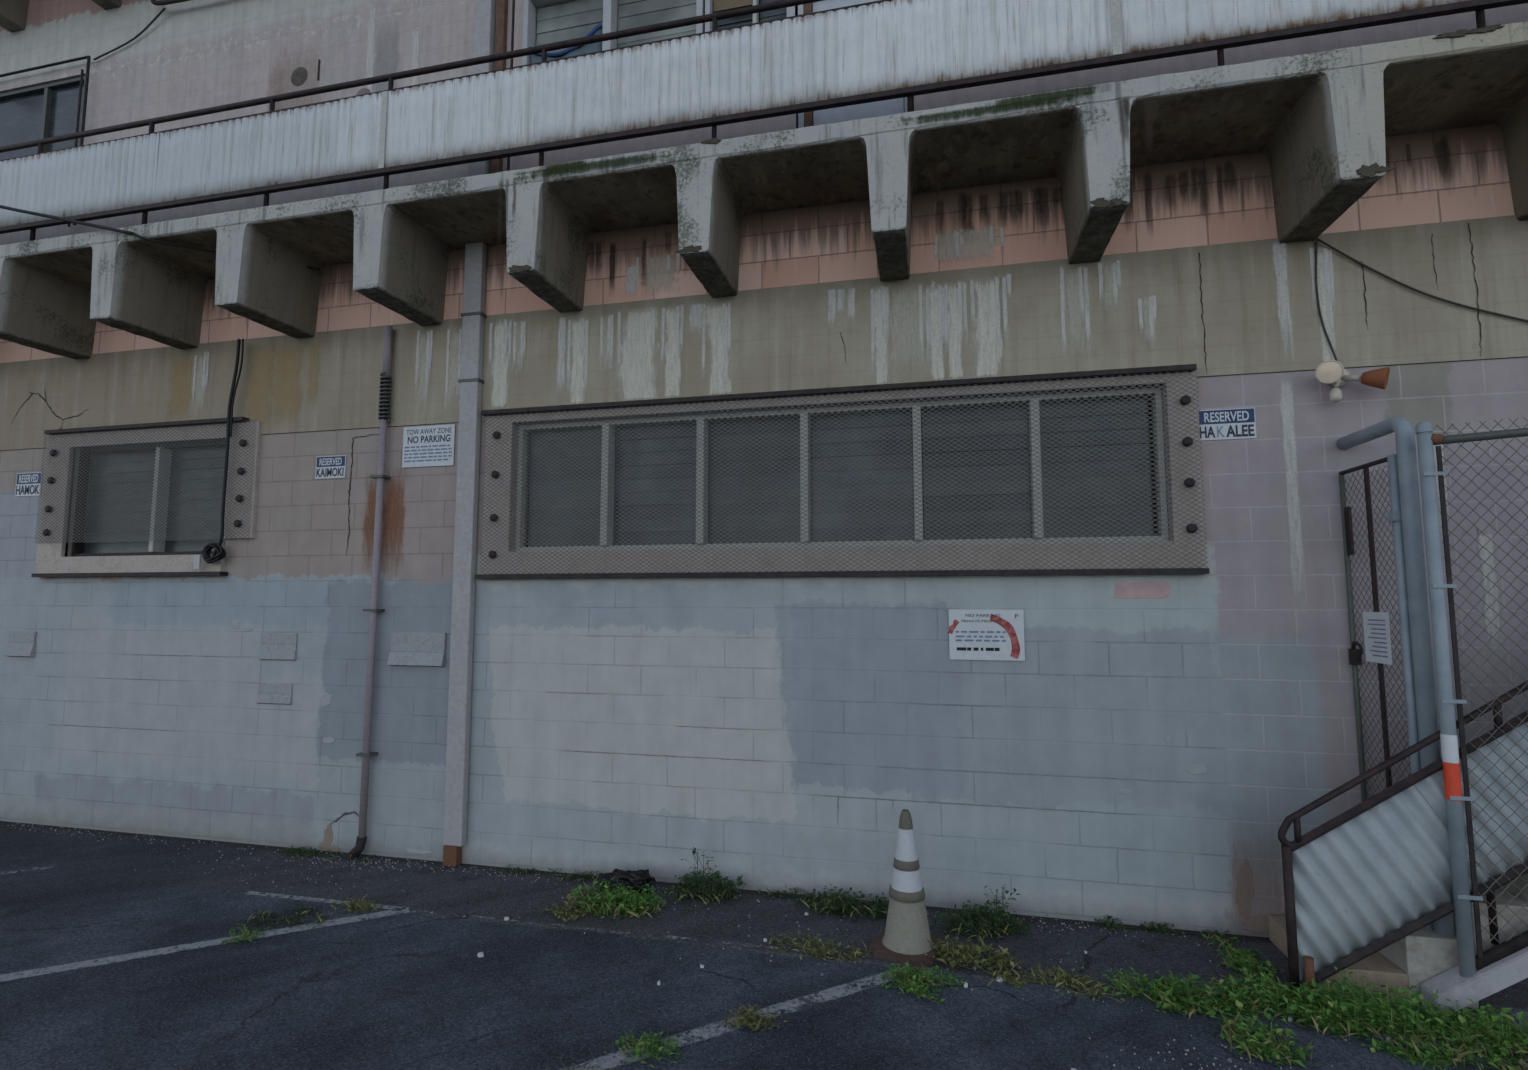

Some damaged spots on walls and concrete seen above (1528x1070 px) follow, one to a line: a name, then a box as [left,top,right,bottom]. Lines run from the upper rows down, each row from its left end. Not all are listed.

leakage [489,321,526,408]
leakage [557,302,732,404]
leakage [626,253,680,294]
leakage [828,274,1011,384]
leakage [1060,261,1121,346]
leakage [1138,296,1157,338]
crack [11,392,86,429]
rust [364,482,404,549]
crack [329,811,359,825]